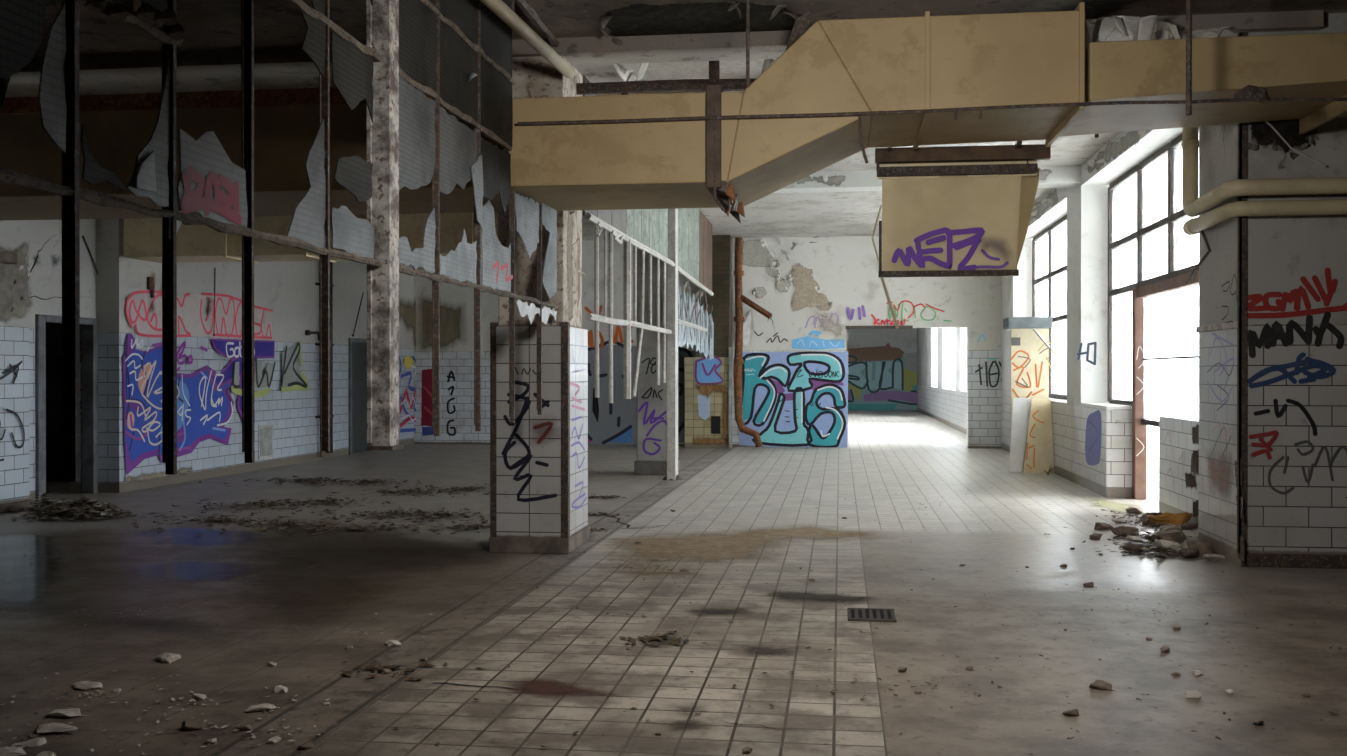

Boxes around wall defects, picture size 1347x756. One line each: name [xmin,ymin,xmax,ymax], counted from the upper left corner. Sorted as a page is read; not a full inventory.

peeling [0,245,33,321]
peeling [742,237,833,312]